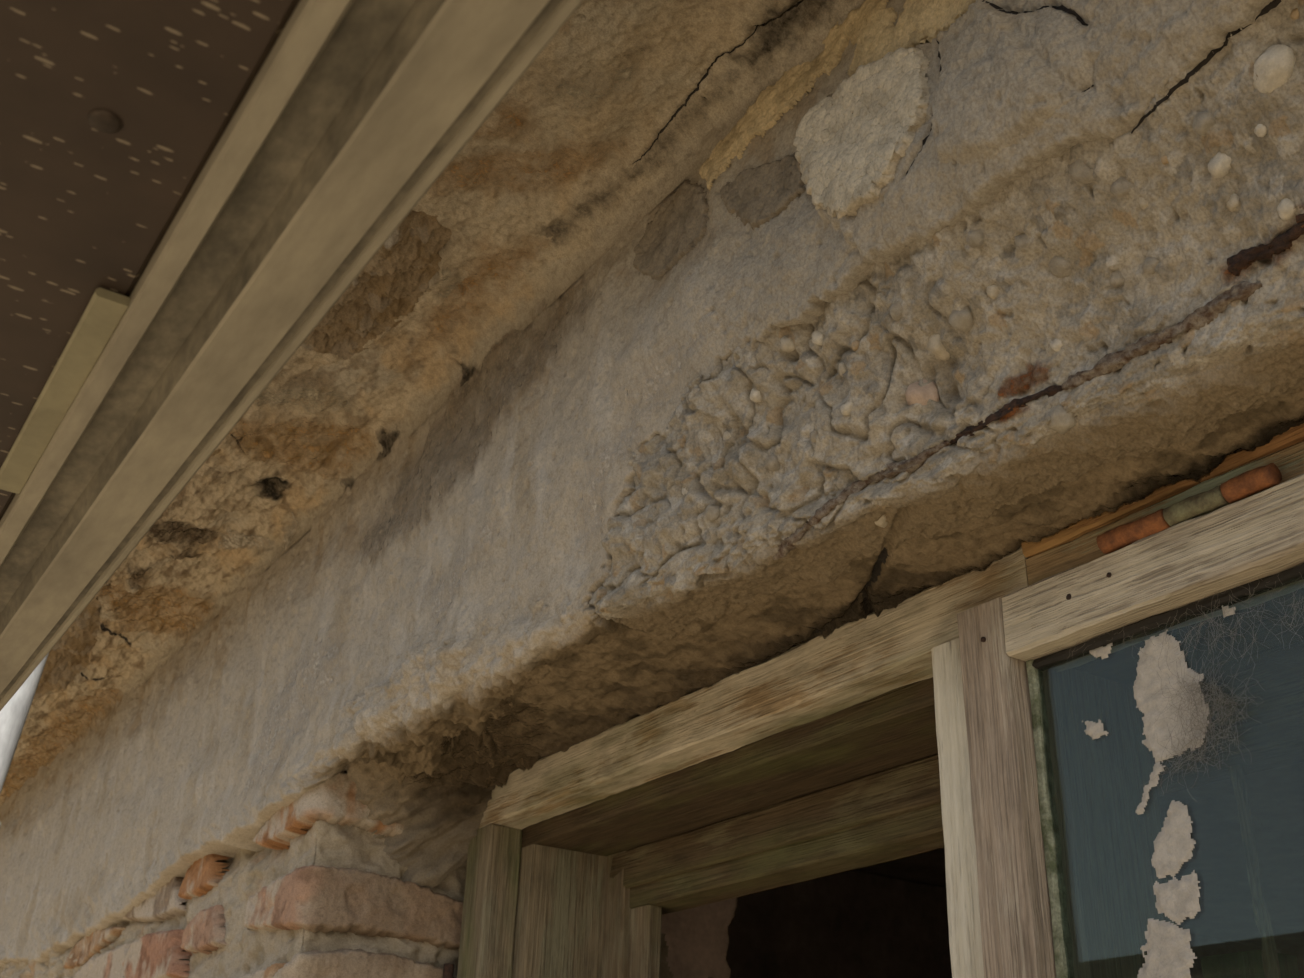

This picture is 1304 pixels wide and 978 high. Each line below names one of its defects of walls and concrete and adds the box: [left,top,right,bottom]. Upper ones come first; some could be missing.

crack [633,0,804,164]
crack [1131,0,1282,134]
spalling [301,209,452,360]
spalling [589,0,1304,640]
rust [773,206,1304,560]
spalling [33,597,104,700]
crack [792,547,889,648]